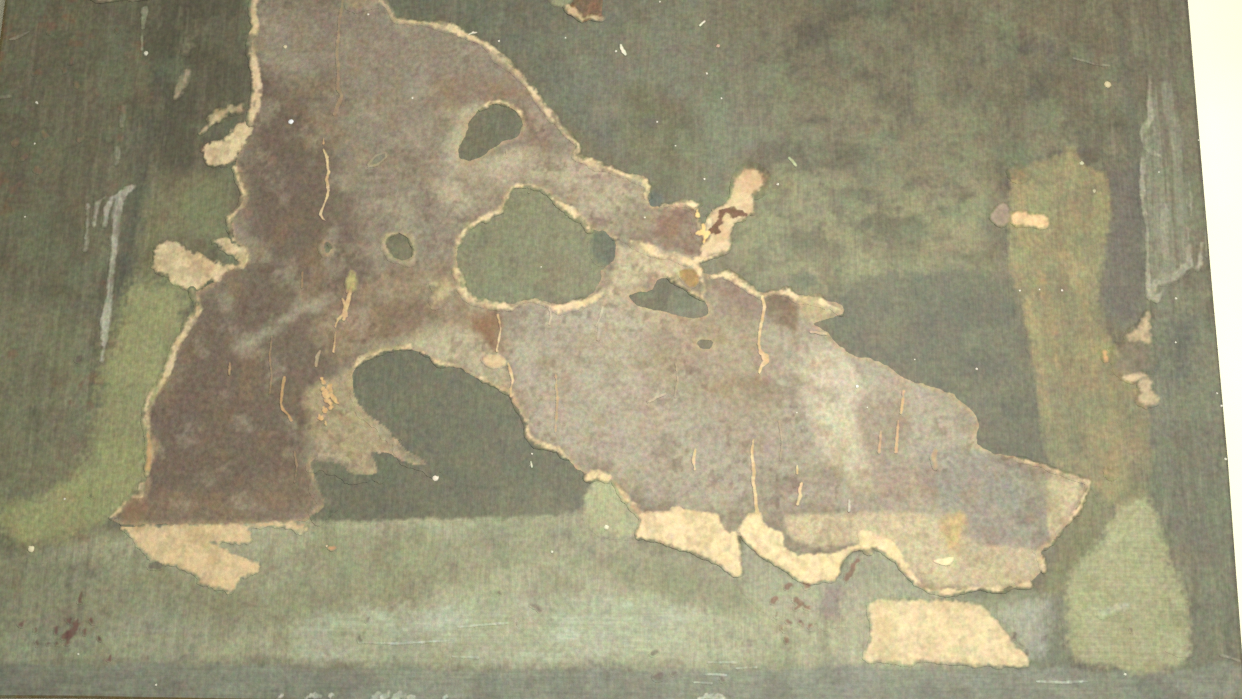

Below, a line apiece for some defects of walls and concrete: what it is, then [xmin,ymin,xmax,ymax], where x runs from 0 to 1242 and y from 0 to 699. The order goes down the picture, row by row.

peeling [197,102,257,168]
peeling [989,202,1051,230]
peeling [151,236,251,294]
peeling [428,275,457,310]
peeling [677,267,700,289]
peeling [480,352,508,369]
peeling [1101,309,1161,409]
peeling [317,377,340,426]
peeling [120,519,309,595]
peeling [634,505,1032,669]